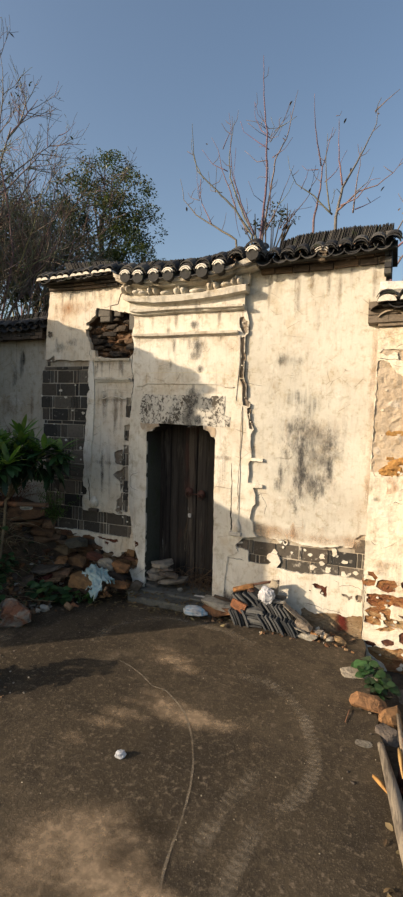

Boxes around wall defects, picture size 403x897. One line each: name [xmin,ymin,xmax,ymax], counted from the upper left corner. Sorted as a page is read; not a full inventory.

spalling [90,308,134,358]
peeling [40,357,159,590]
leakage [294,428,333,492]
peeling [370,349,403,477]
peeling [237,535,403,674]